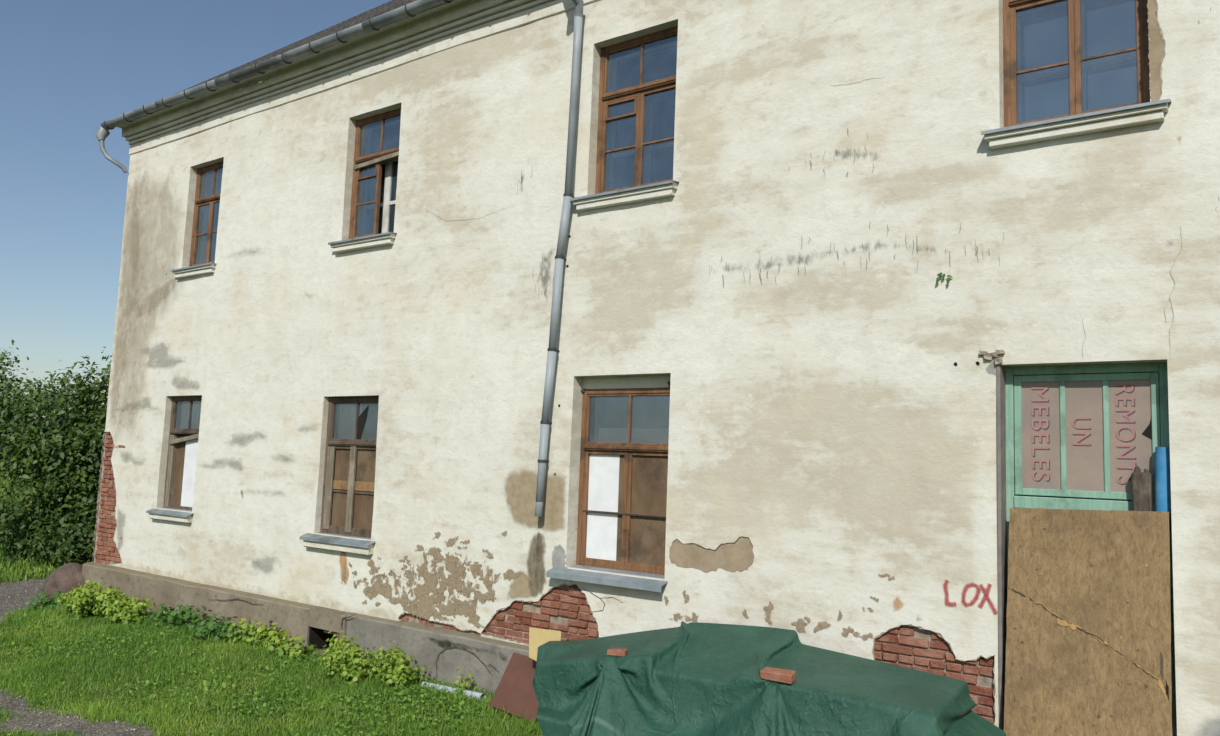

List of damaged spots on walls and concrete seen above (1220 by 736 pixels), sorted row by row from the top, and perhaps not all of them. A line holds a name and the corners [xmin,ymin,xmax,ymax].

flaking render [1147,0,1166,102]
crack [1164,227,1182,357]
flaking render [92,432,125,565]
flaking render [341,532,599,645]
flaking render [669,536,754,573]
flaking render [763,602,774,624]
flaking render [791,610,996,724]